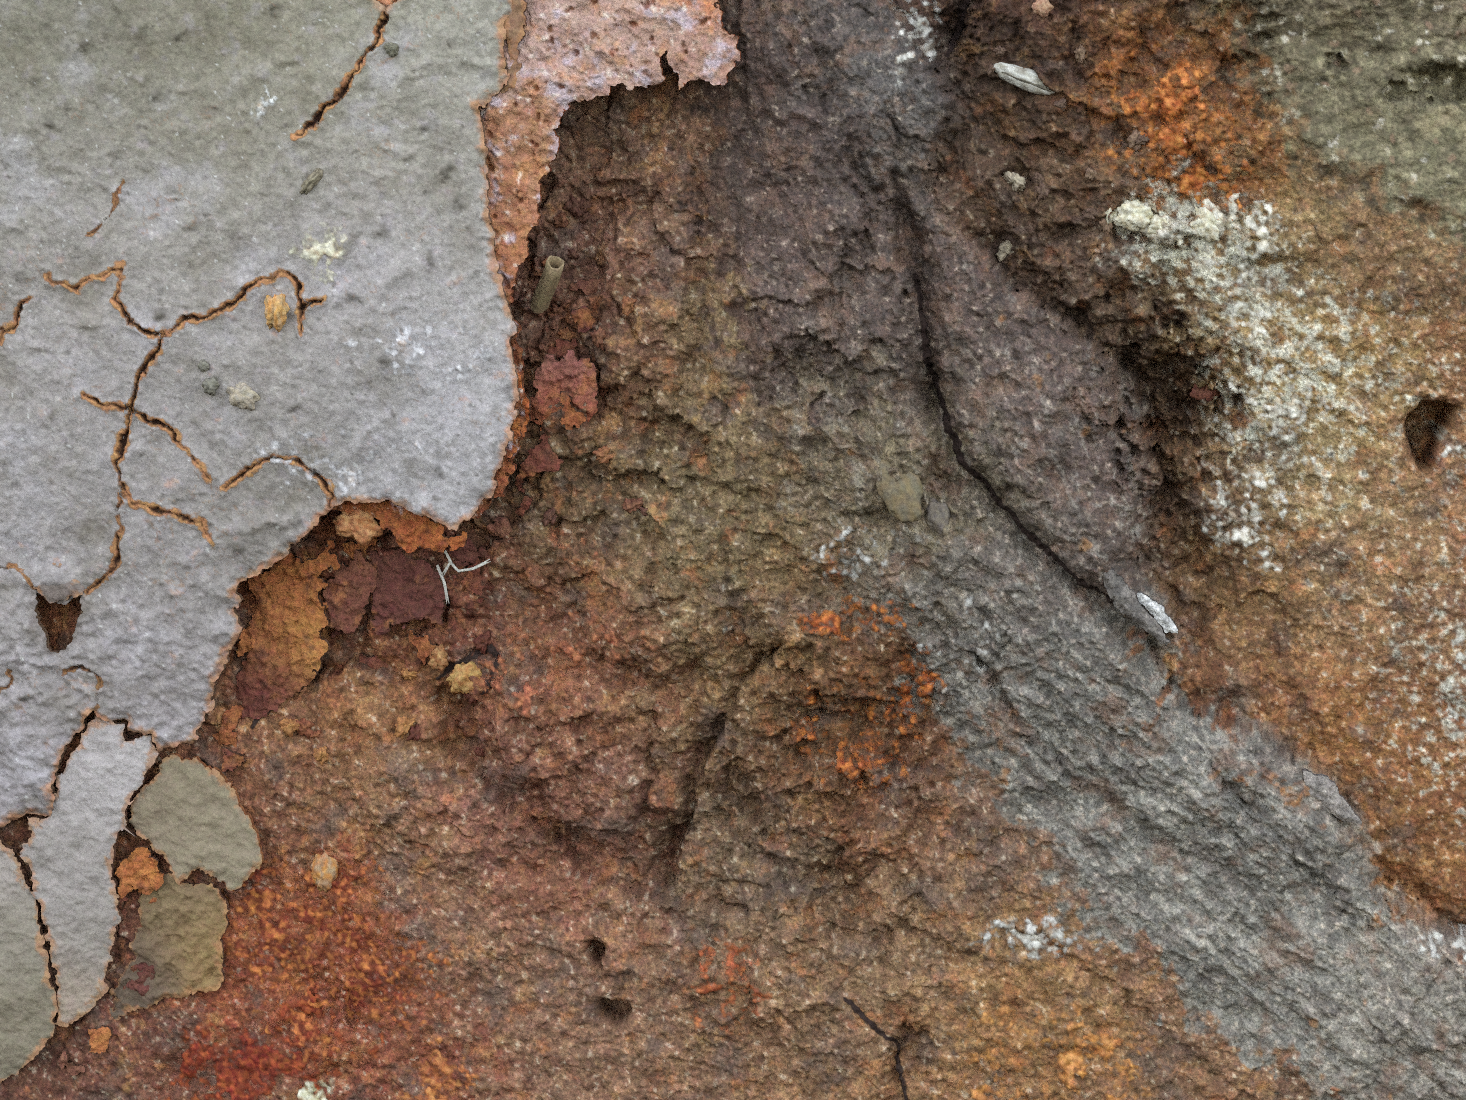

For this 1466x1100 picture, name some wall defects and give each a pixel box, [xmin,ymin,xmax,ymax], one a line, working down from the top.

crack [290,11,389,141]
damp [892,1,942,84]
crack [0,179,336,595]
damp [1114,192,1348,459]
peeling [0,0,944,1084]
damp [1202,471,1296,571]
damp [1446,635,1466,736]
damp [1403,923,1466,962]